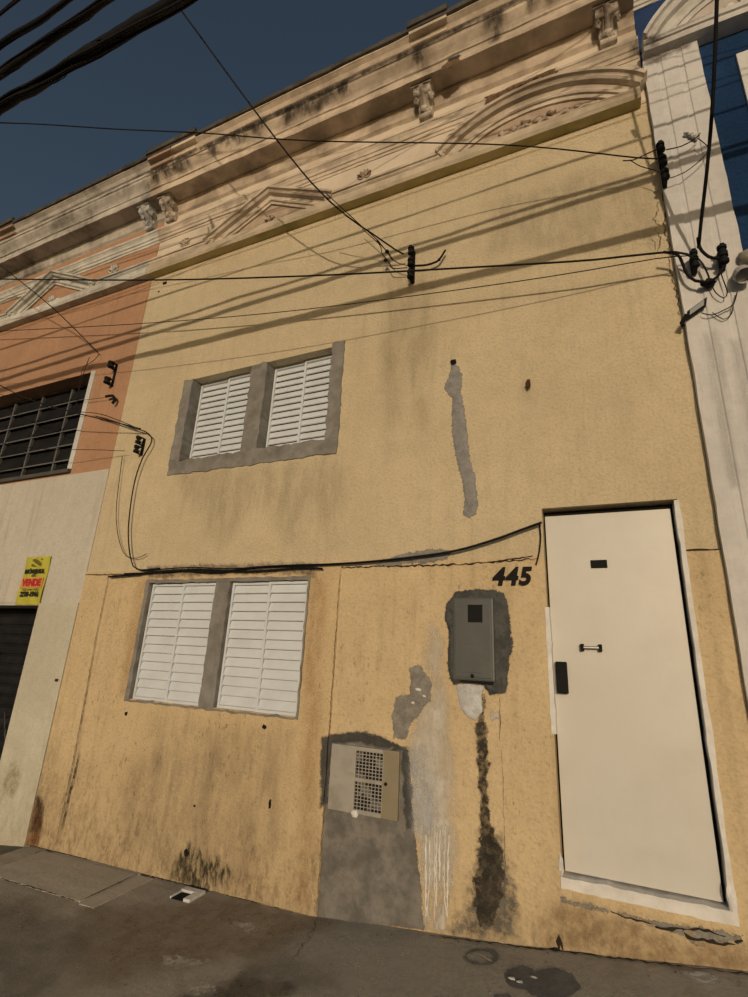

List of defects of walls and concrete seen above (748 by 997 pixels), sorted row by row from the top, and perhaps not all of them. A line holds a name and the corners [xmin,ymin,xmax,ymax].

spalling [391,665,432,739]
damp [452,697,516,937]
damp [175,844,230,888]
damp [425,830,450,921]
spalling [560,897,743,947]